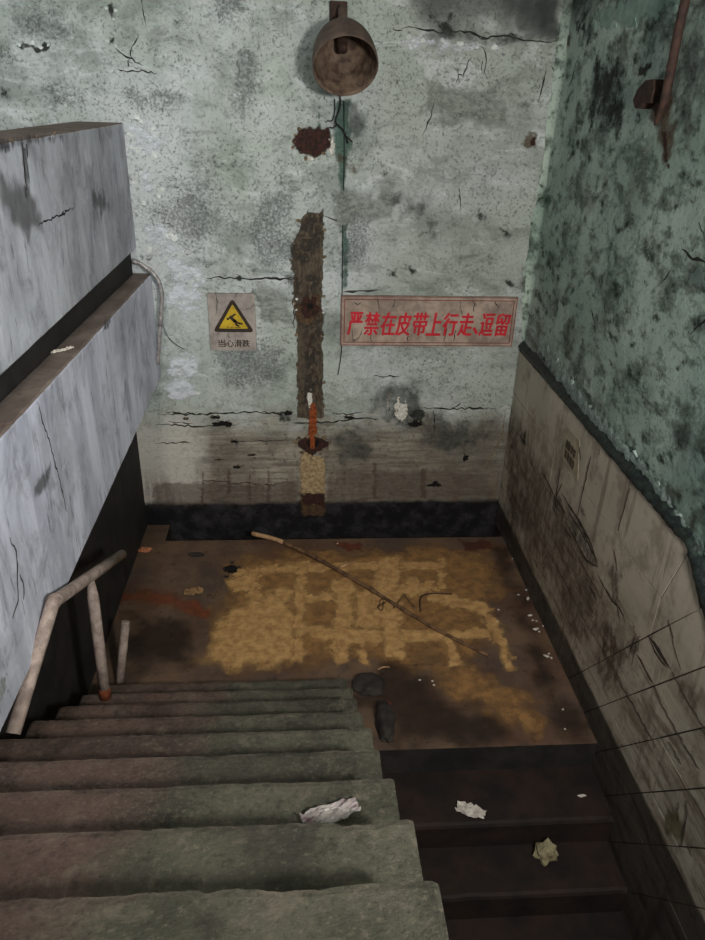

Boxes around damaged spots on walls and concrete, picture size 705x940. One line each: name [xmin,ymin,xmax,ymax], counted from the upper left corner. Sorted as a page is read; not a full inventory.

spalling [17,40,50,53]
crack [116,0,156,74]
damp [429,13,454,37]
crack [393,26,556,82]
mould [588,58,624,140]
corrosion [291,127,342,161]
crack [38,207,74,226]
crack [206,274,293,283]
corrosion [293,295,325,348]
corrosion [307,393,317,449]
damp [376,387,425,426]
damp [519,328,701,556]